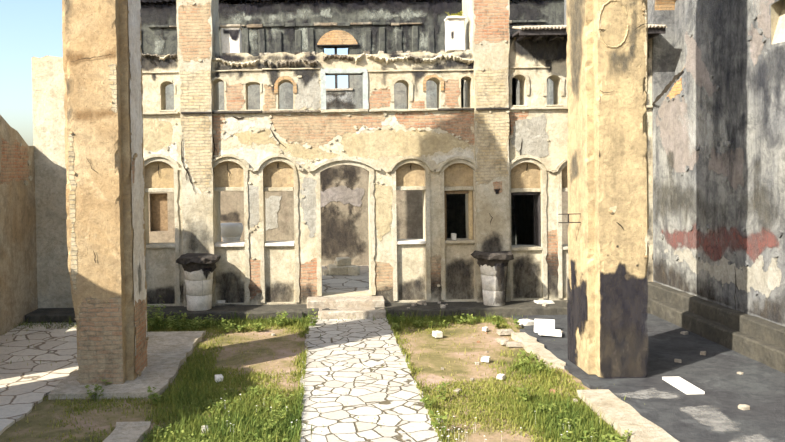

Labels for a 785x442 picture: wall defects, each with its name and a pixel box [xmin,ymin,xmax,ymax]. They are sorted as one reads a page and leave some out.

leakage [509,0,583,94]
leakage [757,45,784,123]
crack [181,139,196,194]
peeling [128,0,549,377]
leakage [376,259,483,303]
leakage [483,234,501,252]
leakage [513,254,559,301]
leakage [567,260,586,361]
leakage [646,263,715,300]
leakage [647,183,725,244]
peeling [660,225,784,298]
leakage [601,330,648,377]